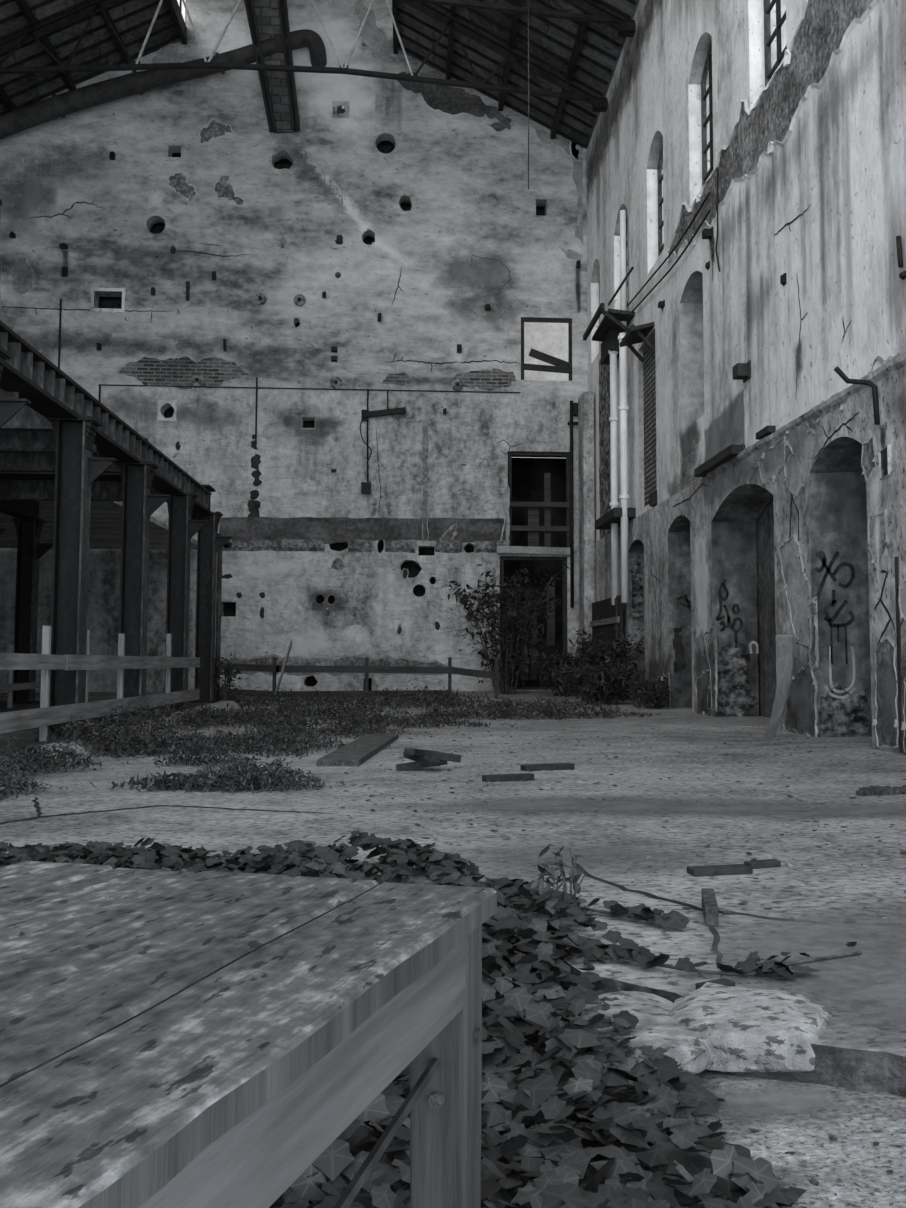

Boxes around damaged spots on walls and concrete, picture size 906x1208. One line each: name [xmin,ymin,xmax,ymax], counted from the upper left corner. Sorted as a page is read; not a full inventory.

spalling [352,0,514,133]
crack [30,202,104,218]
spalling [140,210,175,254]
peeling [164,118,233,202]
spalling [377,140,395,154]
spalling [531,123,585,264]
spalling [667,0,880,263]
damp [445,255,513,318]
spalling [114,354,252,422]
spalling [447,366,518,392]
peeling [867,507,890,574]
spalling [778,533,906,754]